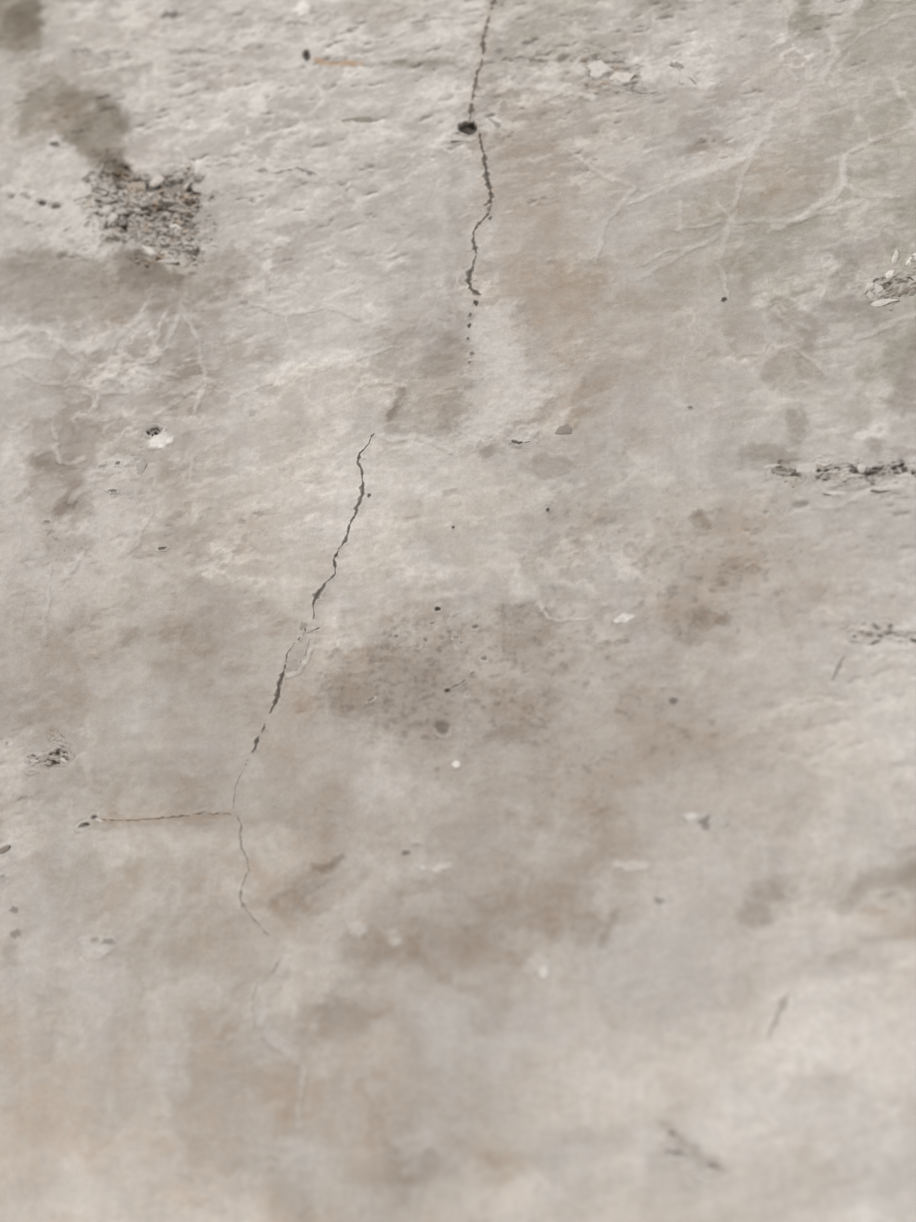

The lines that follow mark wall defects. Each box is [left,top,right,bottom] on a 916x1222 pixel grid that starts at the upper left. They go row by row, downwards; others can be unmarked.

leakage [0,0,139,178]
spalling [0,149,228,282]
crack [456,0,577,366]
spalling [855,238,916,311]
spalling [765,454,916,500]
crack [74,433,376,1049]
leakage [309,591,566,763]
spalling [832,616,916,668]